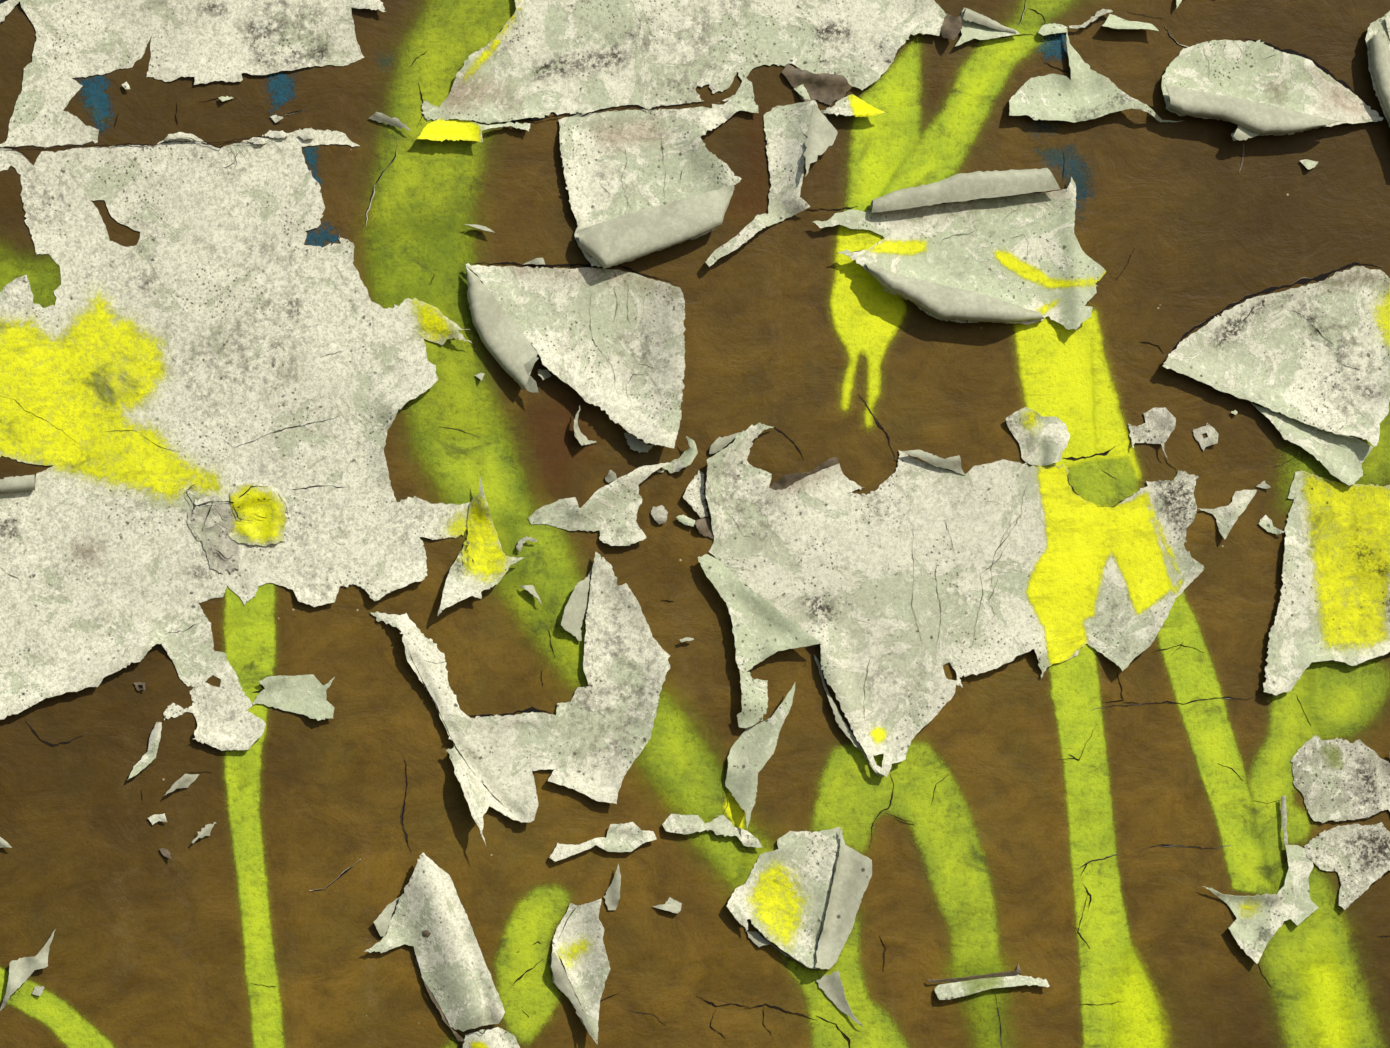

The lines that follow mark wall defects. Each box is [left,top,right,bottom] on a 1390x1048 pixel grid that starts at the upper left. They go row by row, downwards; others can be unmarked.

peeling [813,168,1106,330]
peeling [1009,9,1390,141]
peeling [1300,159,1318,170]
peeling [0,0,1019,847]
peeling [1163,266,1390,695]
peeling [651,407,1271,1026]
crack [1059,671,1262,760]
peeling [550,822,657,862]
peeling [1202,735,1390,964]
peeling [364,853,520,1048]
peeling [551,864,621,1044]
crack [697,996,851,1048]